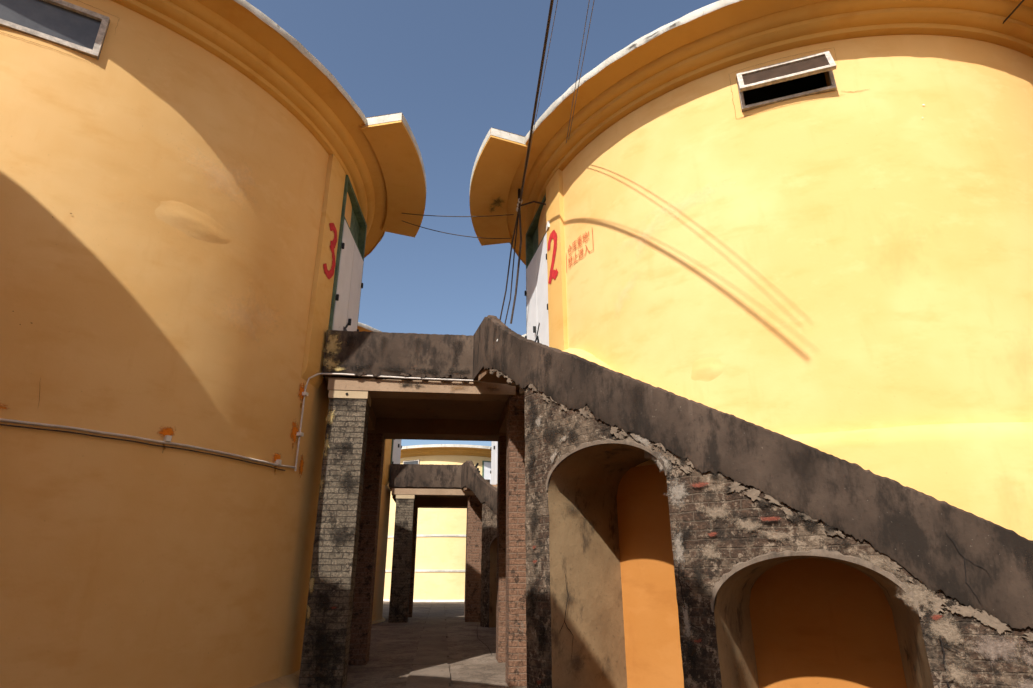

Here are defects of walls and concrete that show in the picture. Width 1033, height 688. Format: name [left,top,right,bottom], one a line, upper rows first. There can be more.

damp [384,366,436,388]
damp [529,404,577,463]
spalling [610,426,709,488]
damp [670,481,688,505]
flaking render [699,481,846,559]
damp [789,514,833,531]
damp [675,527,704,589]
damp [528,579,545,652]
flaking render [859,550,1033,665]
flaking render [944,665,974,687]